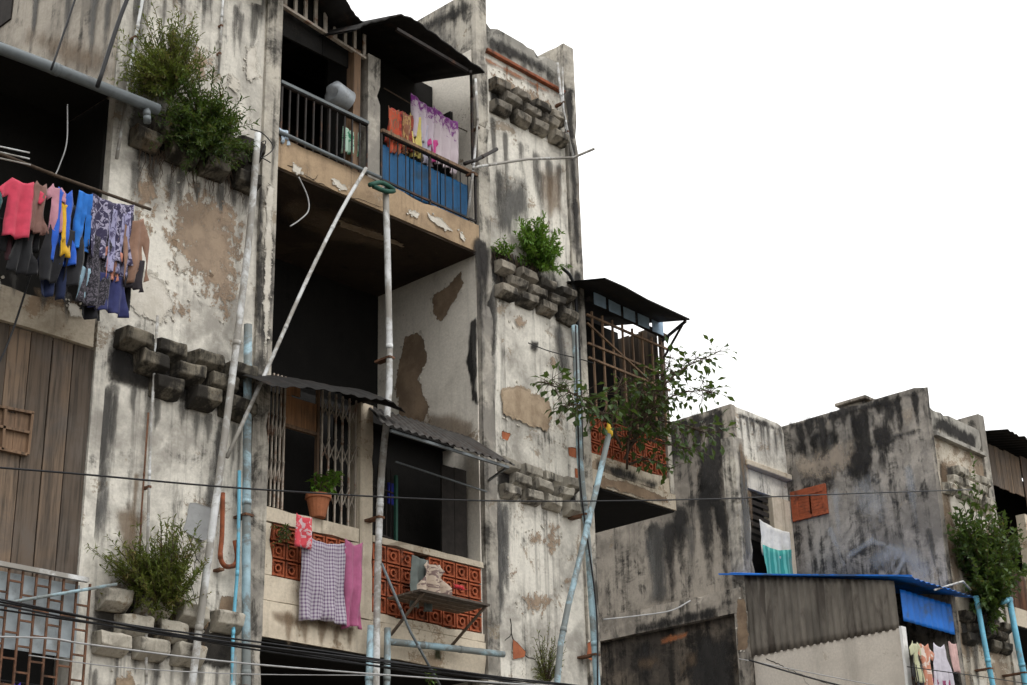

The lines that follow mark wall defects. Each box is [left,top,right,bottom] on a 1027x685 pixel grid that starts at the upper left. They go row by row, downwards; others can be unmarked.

damp [56,0,112,64]
flaking render [130,166,246,326]
flaking render [406,209,466,241]
flaking render [430,271,464,321]
damp [490,89,579,251]
damp [95,349,161,531]
damp [179,388,241,507]
flaking render [379,330,429,422]
flaking render [498,381,555,441]
damp [647,410,728,600]
damp [739,391,919,557]
flaking render [111,669,140,685]